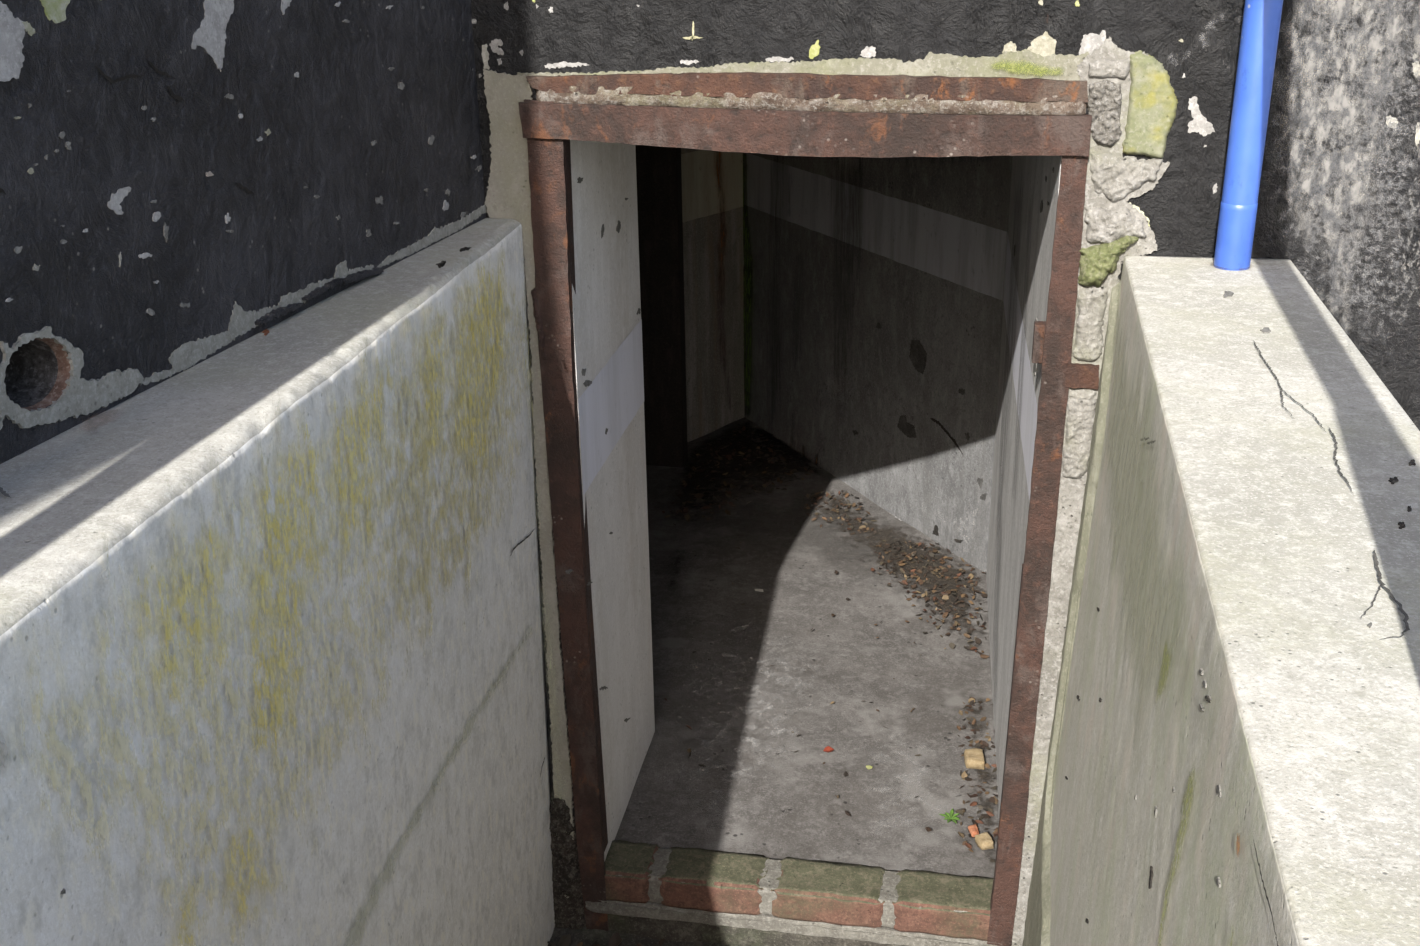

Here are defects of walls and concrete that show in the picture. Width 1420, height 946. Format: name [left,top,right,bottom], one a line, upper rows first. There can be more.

peeling [0,0,70,82]
peeling [191,0,234,72]
peeling [1412,53,1420,78]
rust [531,288,547,359]
crack [1254,341,1353,493]
spalling [0,30,1170,946]
water stain [23,268,533,945]
crack [1361,550,1410,640]
spalling [1199,668,1212,712]
crack [1253,840,1278,946]